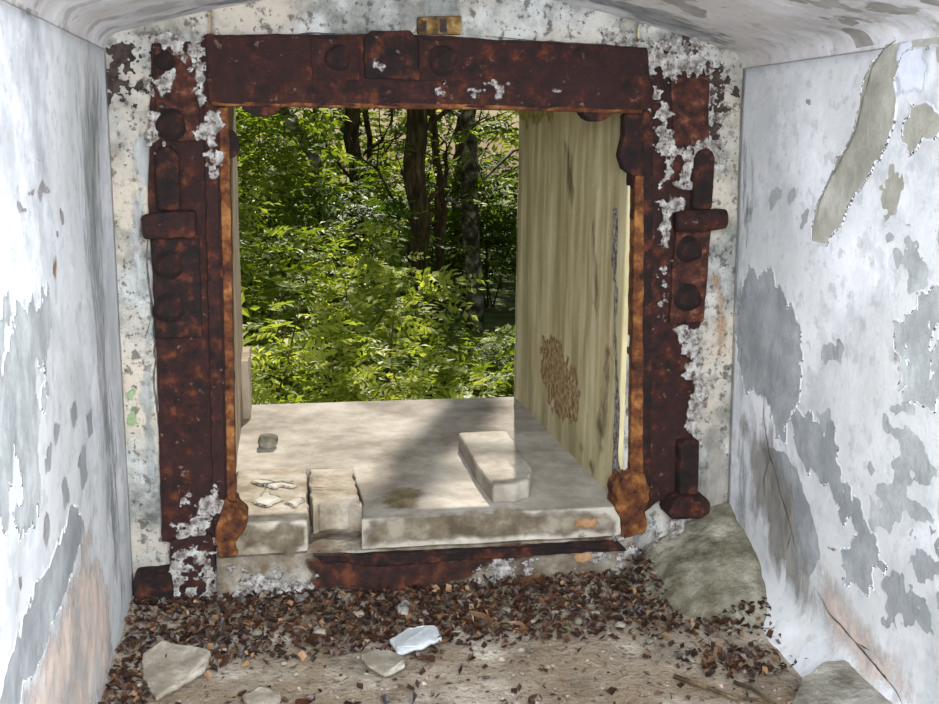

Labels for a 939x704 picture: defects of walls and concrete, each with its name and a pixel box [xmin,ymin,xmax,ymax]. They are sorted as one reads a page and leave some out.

peeling [661,0,707,18]
peeling [141,68,176,155]
peeling [600,28,735,173]
peeling [17,179,50,213]
peeling [734,0,939,635]
peeling [70,400,93,490]
peeling [0,279,85,704]
spalling [251,479,306,507]
peeling [164,484,320,602]
corrosion [307,543,523,594]
corrosion [574,540,602,563]